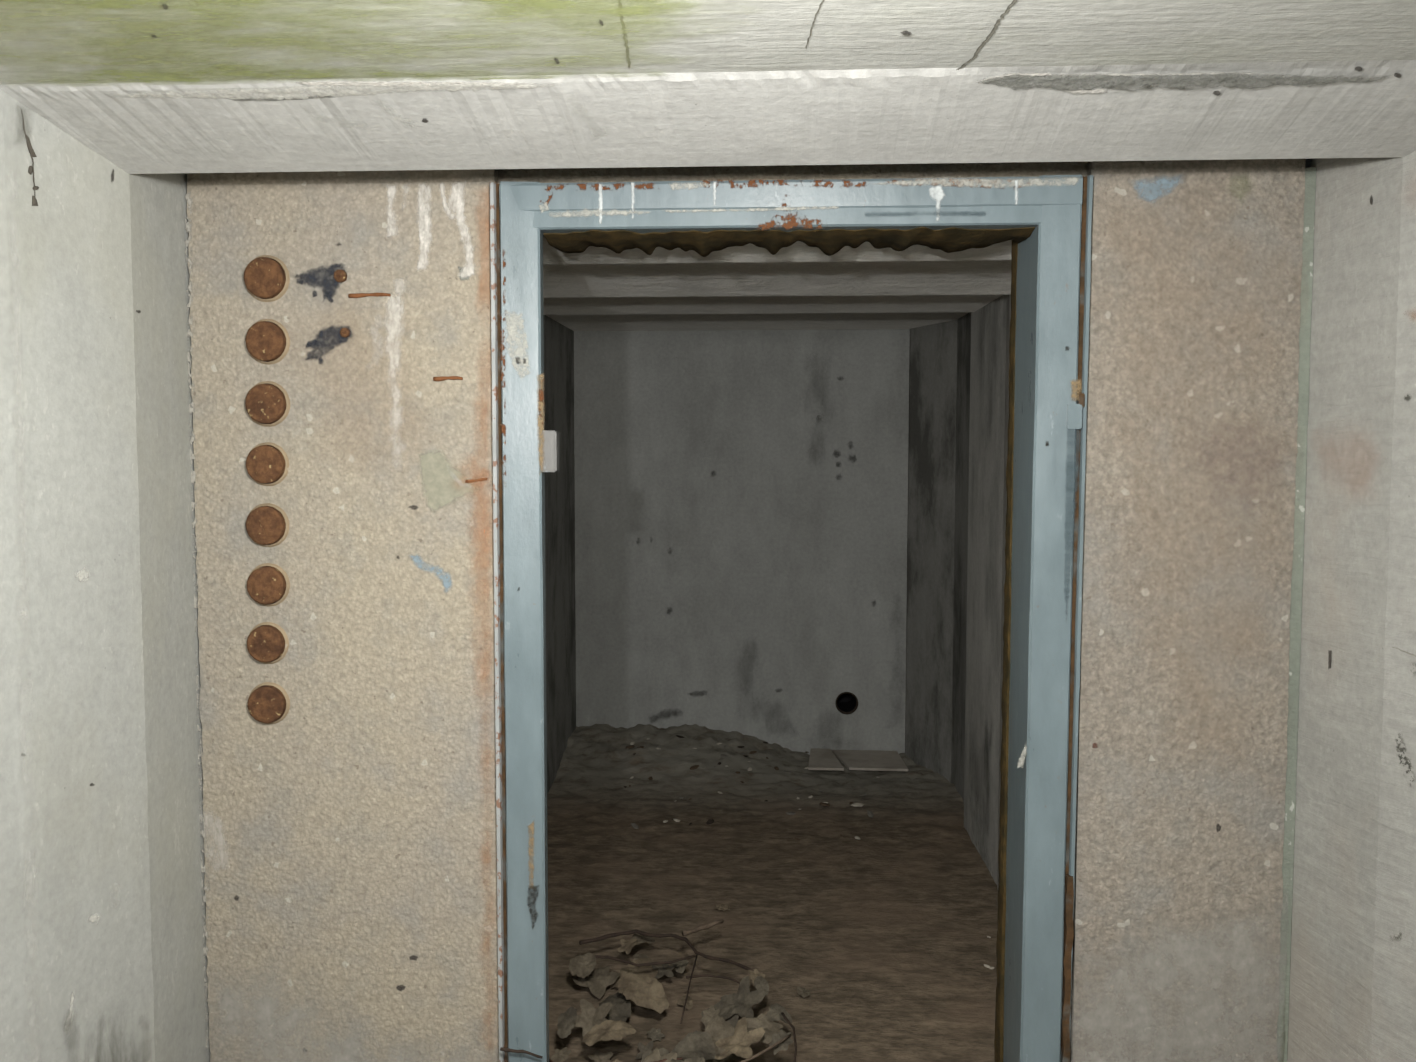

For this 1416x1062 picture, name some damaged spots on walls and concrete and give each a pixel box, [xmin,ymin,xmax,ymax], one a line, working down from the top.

rust [544,183,653,205]
rust [703,179,866,188]
rust [758,203,822,230]